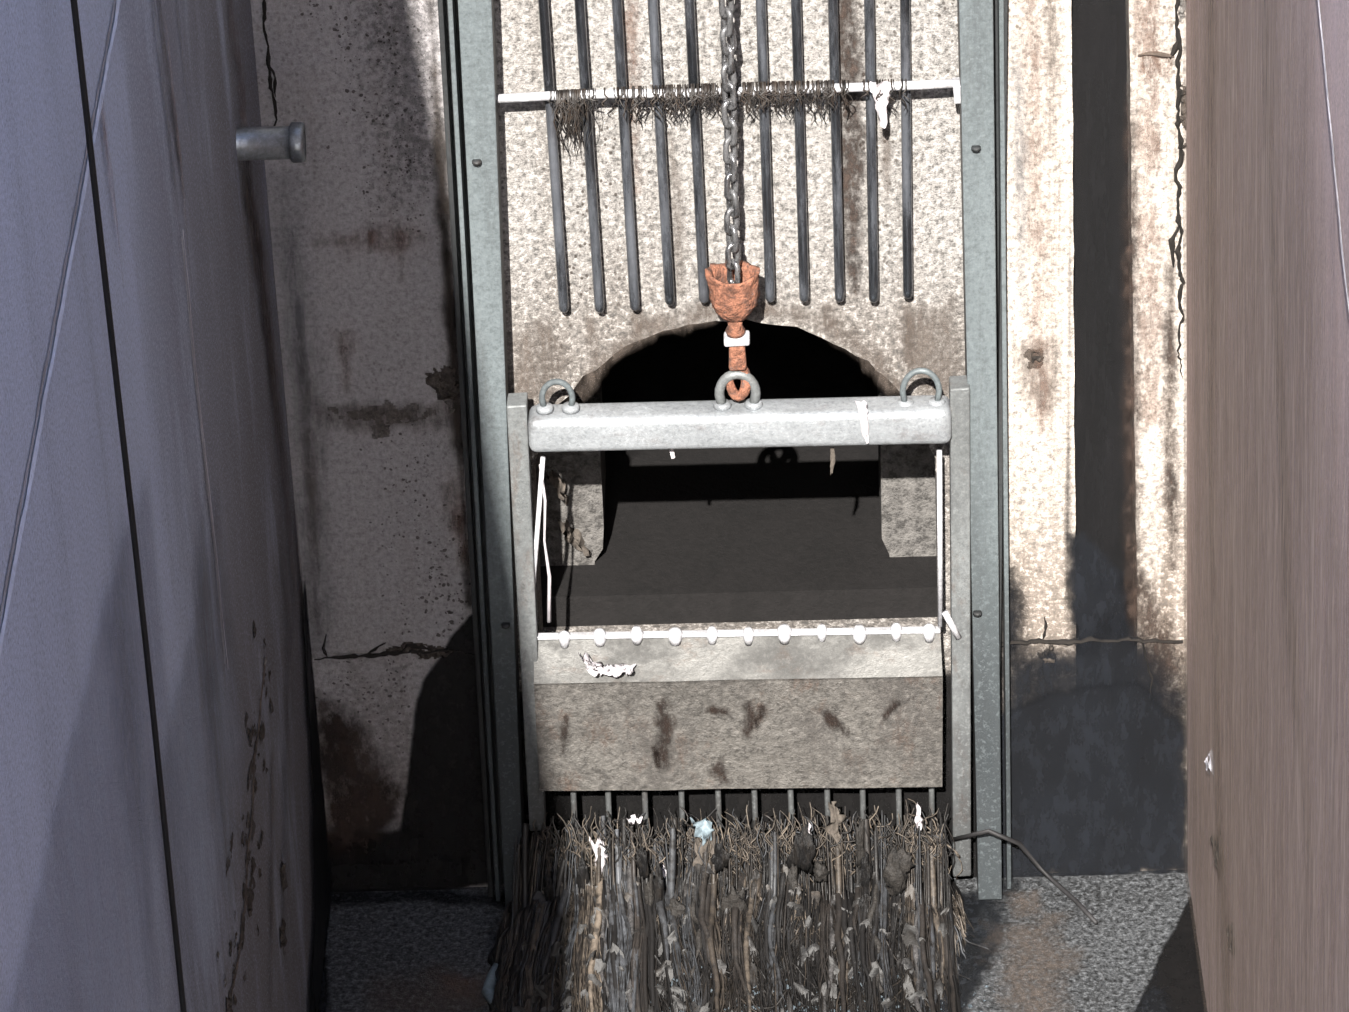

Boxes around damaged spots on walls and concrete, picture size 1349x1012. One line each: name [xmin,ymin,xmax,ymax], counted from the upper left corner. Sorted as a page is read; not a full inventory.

crack [262,0,278,126]
crack [1168,0,1187,378]
water stain [300,0,505,1012]
water stain [936,0,1349,1012]
water stain [519,673,977,878]